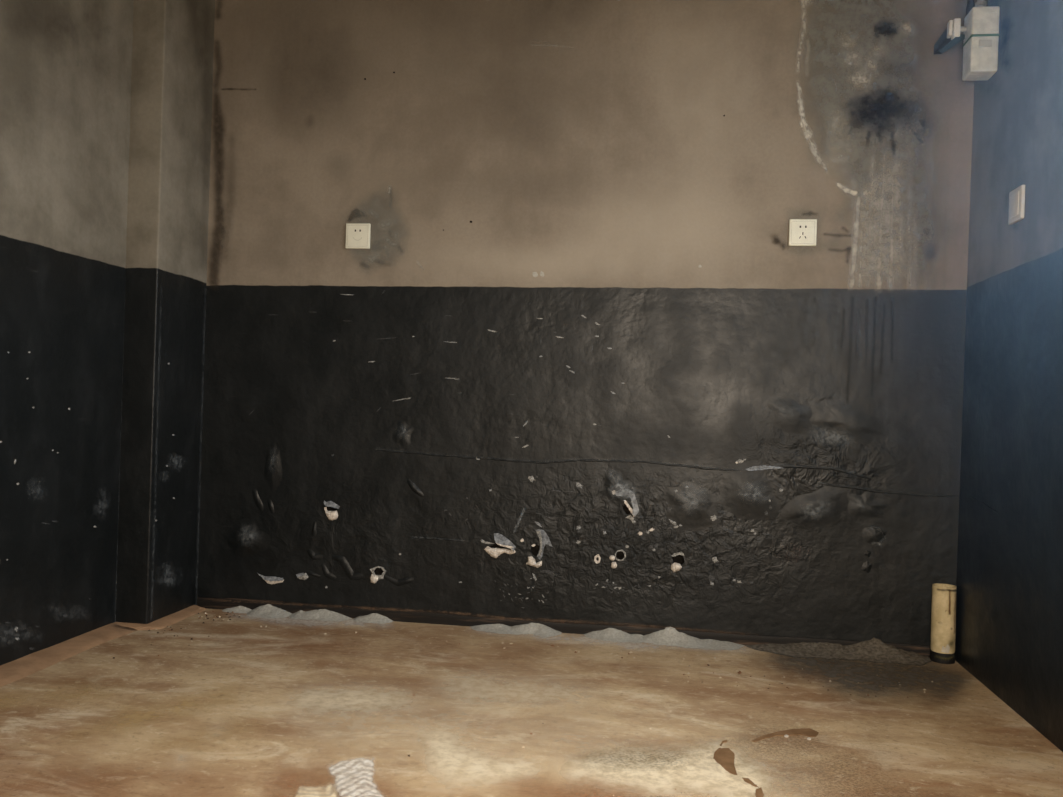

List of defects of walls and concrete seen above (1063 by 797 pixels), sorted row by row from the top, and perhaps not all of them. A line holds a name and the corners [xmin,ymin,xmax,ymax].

leakage [210,95,224,286]
leakage [847,169,898,398]
crack [377,449,743,471]
spalling [324,500,340,520]
spalling [585,470,682,593]
spalling [480,513,555,608]
spalling [671,552,687,572]
peeling [258,573,284,584]
spalling [370,566,386,584]